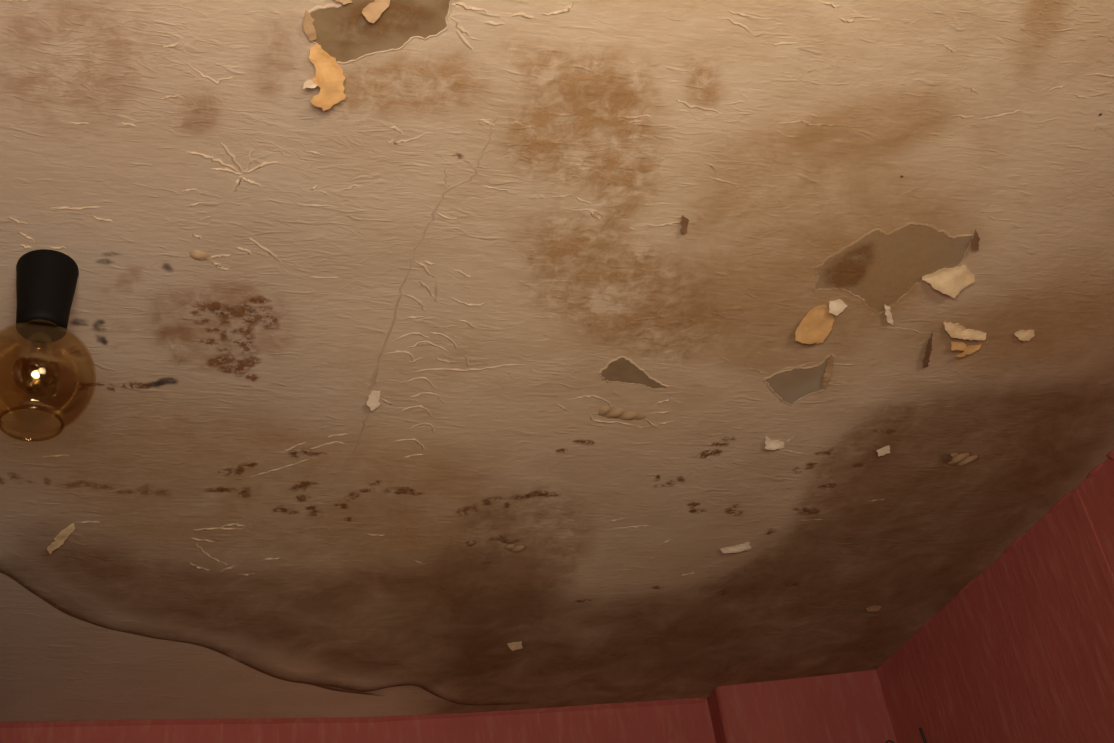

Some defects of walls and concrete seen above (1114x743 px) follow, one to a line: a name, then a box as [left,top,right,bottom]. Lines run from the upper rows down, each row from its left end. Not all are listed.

peeling [303,0,452,111]
peeling [763,222,986,406]
peeling [1014,329,1035,341]
leakage [150,378,176,387]
peeling [598,356,669,390]
peeling [47,523,75,554]
leakage [0,390,1108,713]
peeling [720,542,752,554]